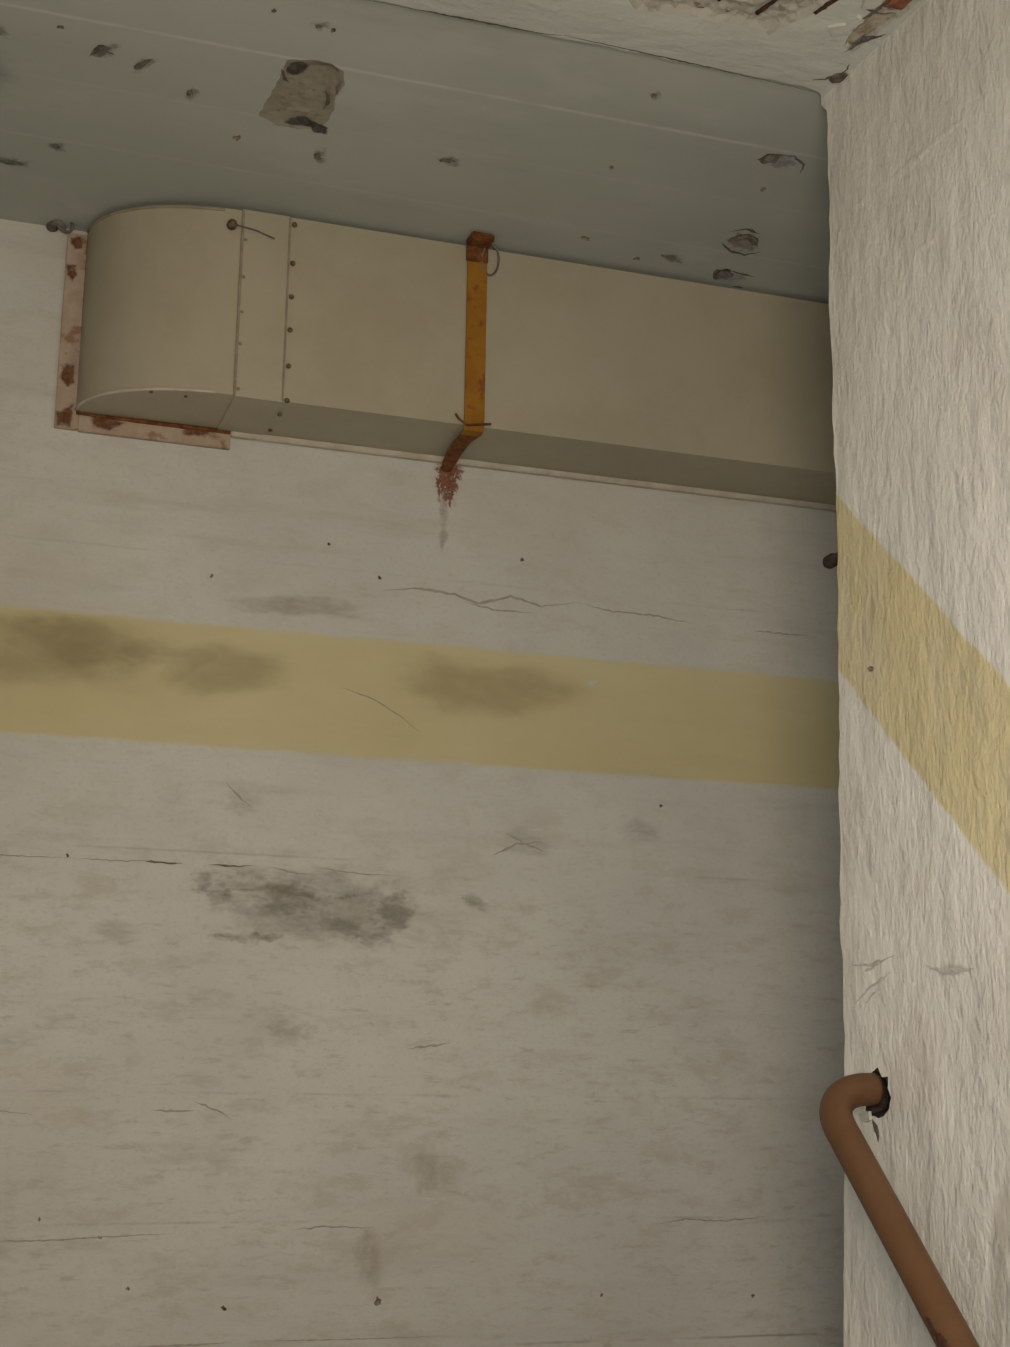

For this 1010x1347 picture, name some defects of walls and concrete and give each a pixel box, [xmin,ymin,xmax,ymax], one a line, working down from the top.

spalling [629,0,920,84]
spalling [259,59,345,134]
corrosion [61,365,74,386]
corrosion [57,405,73,426]
corrosion [93,417,123,430]
corrosion [436,463,464,507]
crack [383,587,693,624]